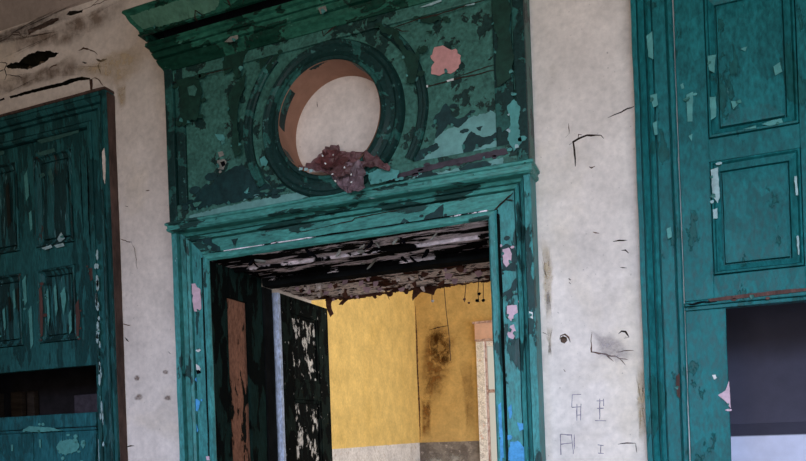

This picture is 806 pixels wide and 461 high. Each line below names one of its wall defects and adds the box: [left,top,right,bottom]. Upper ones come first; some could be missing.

flaking render [6,51,58,69]
peeling [368,17,461,87]
peeling [180,49,308,220]
peeling [366,93,527,185]
crack [566,106,634,169]
peeling [710,162,722,219]
peeling [191,283,201,312]
peeling [247,232,490,317]
peeling [500,236,519,346]
damp [426,333,449,394]
crack [590,330,634,363]
peeling [23,423,85,461]